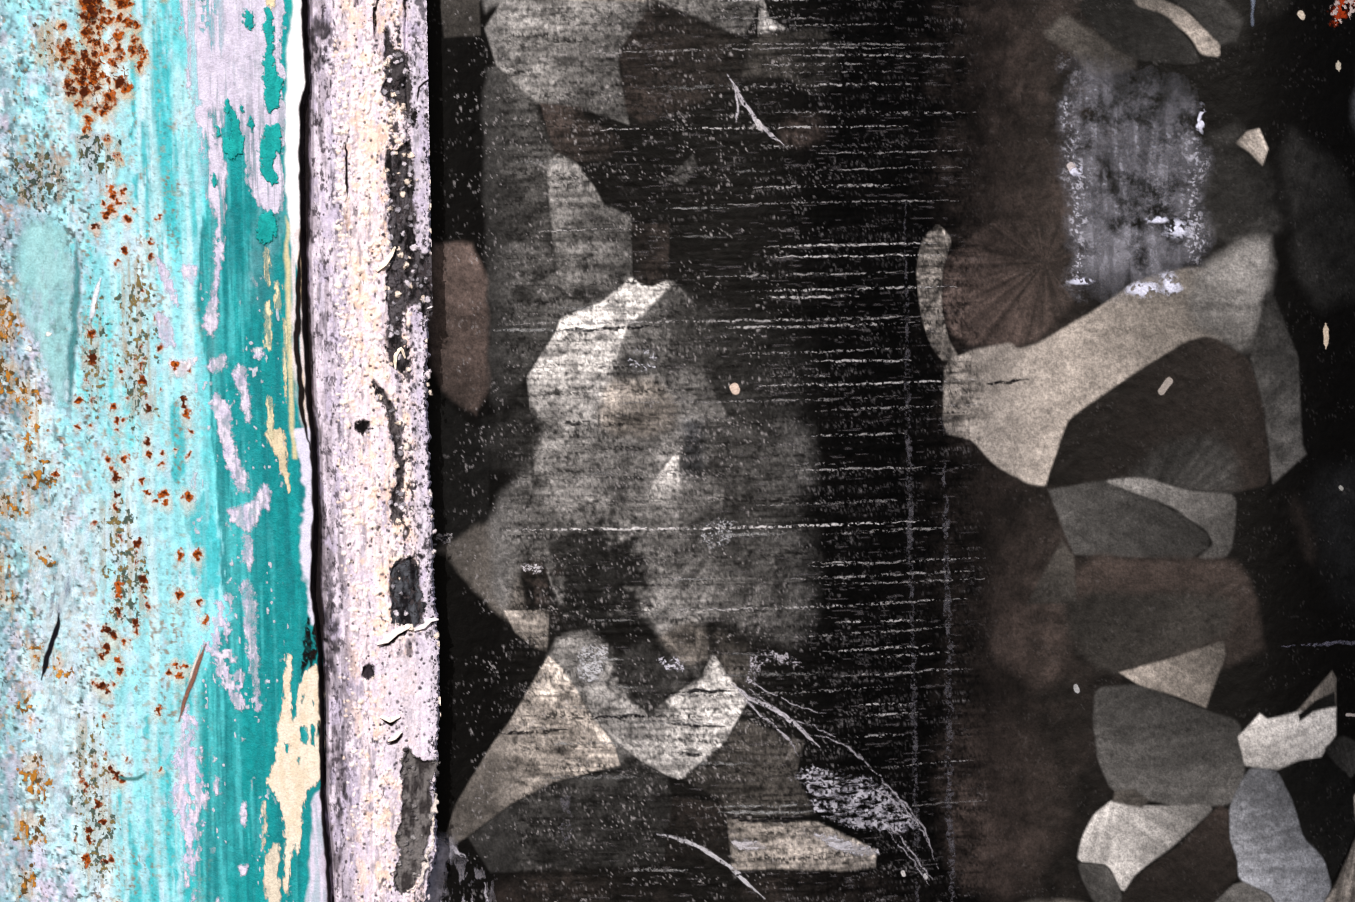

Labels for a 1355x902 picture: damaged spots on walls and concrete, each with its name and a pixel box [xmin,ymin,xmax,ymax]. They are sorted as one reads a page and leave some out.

corrosion [9,0,148,236]
peeling [179,0,289,396]
corrosion [1331,0,1355,27]
corrosion [0,295,60,519]
corrosion [70,238,195,896]
corrosion [175,547,203,566]
peeling [155,258,291,711]
spalling [371,29,440,667]
corrosion [13,740,54,898]
peeling [168,706,219,901]
peeling [238,654,325,902]
spalling [380,683,441,902]